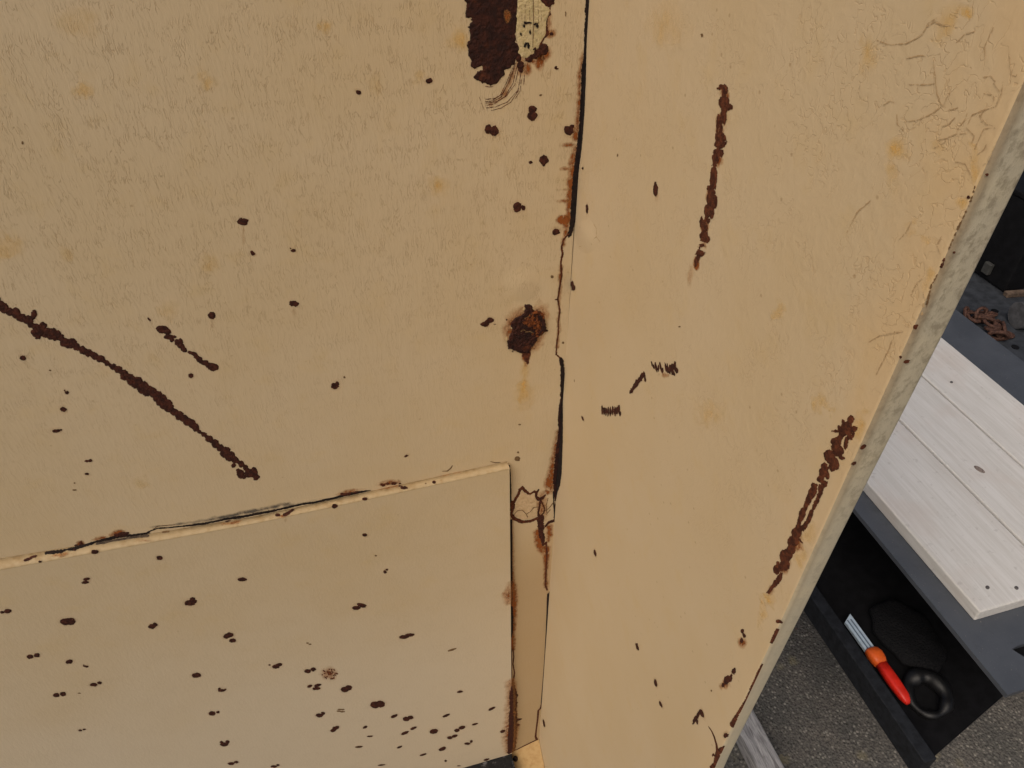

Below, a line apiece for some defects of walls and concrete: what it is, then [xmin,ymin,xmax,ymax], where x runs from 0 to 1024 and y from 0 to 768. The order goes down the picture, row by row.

peeling [464,0,555,86]
rust [480,304,548,364]
crack [516,0,589,750]
rust [629,361,678,394]
rust [601,405,621,417]
rust [510,486,555,566]
rust [304,667,352,692]
rust [710,668,736,692]
rust [370,701,417,749]
rust [430,723,478,766]